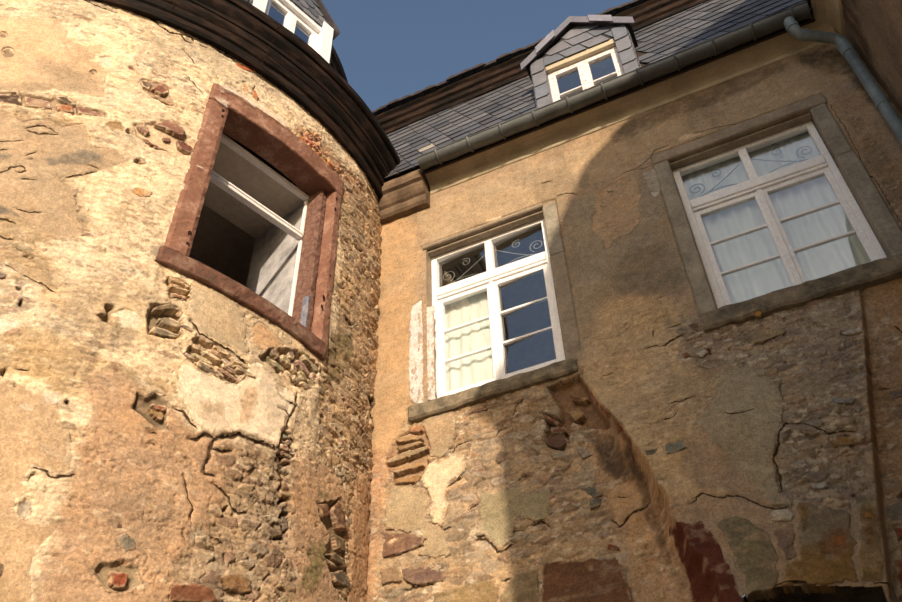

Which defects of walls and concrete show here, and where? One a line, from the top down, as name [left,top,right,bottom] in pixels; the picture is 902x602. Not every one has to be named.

flaking render [0,15,195,156]
flaking render [132,275,321,469]
crack [174,390,298,539]
spalling [264,497,291,542]
peeling [408,300,436,404]
flaking render [380,424,632,602]
spalling [542,374,611,460]
flaking render [580,480,647,521]
flaking render [645,440,687,455]
flaking render [693,366,793,508]
crack [690,422,856,510]
flaking render [169,573,252,602]